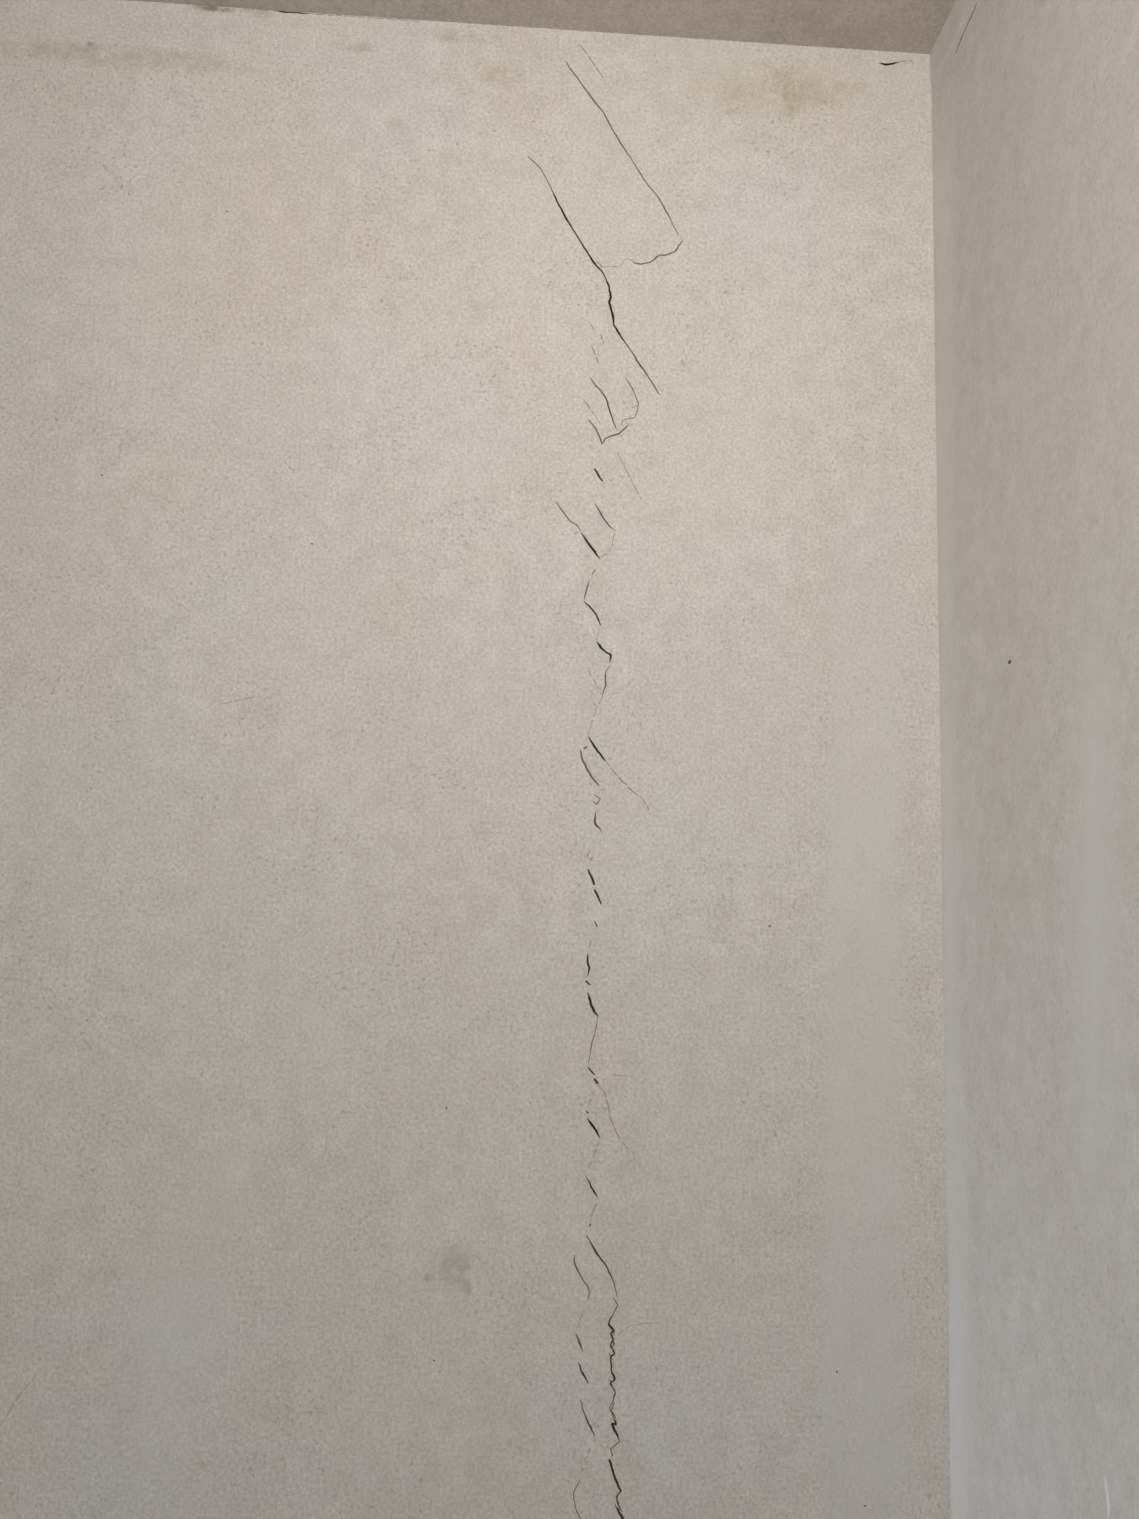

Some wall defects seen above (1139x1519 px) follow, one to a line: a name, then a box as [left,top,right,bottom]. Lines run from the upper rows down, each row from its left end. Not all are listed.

crack [528,45,683,1519]